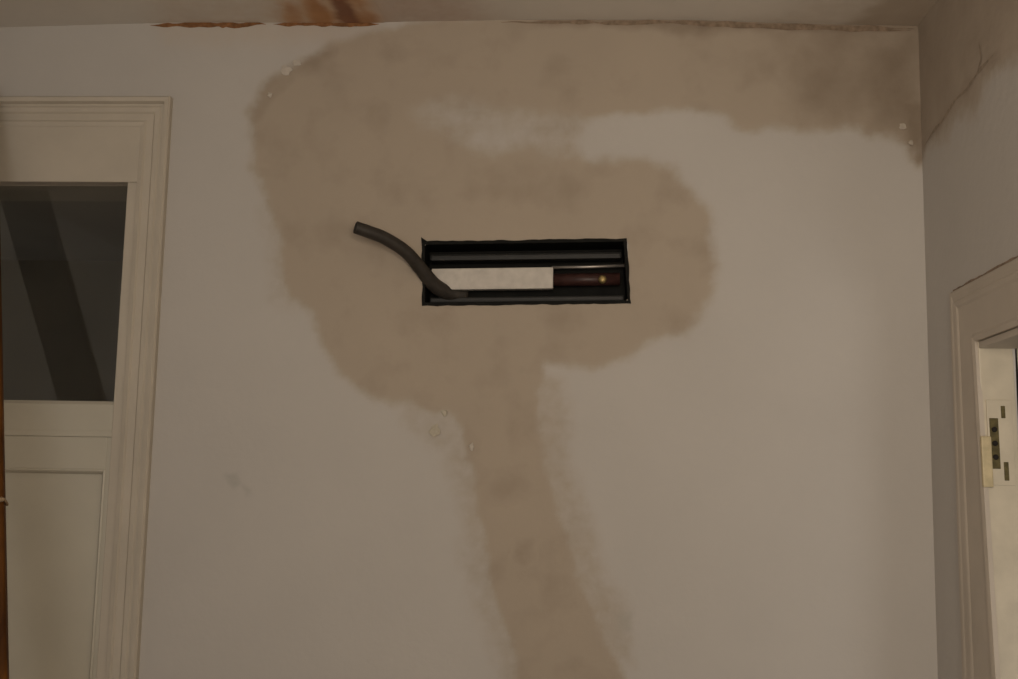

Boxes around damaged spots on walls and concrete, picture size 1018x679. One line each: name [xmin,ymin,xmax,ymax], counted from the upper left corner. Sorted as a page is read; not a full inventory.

corrosion [134,0,402,56]
water stain [237,0,1018,679]